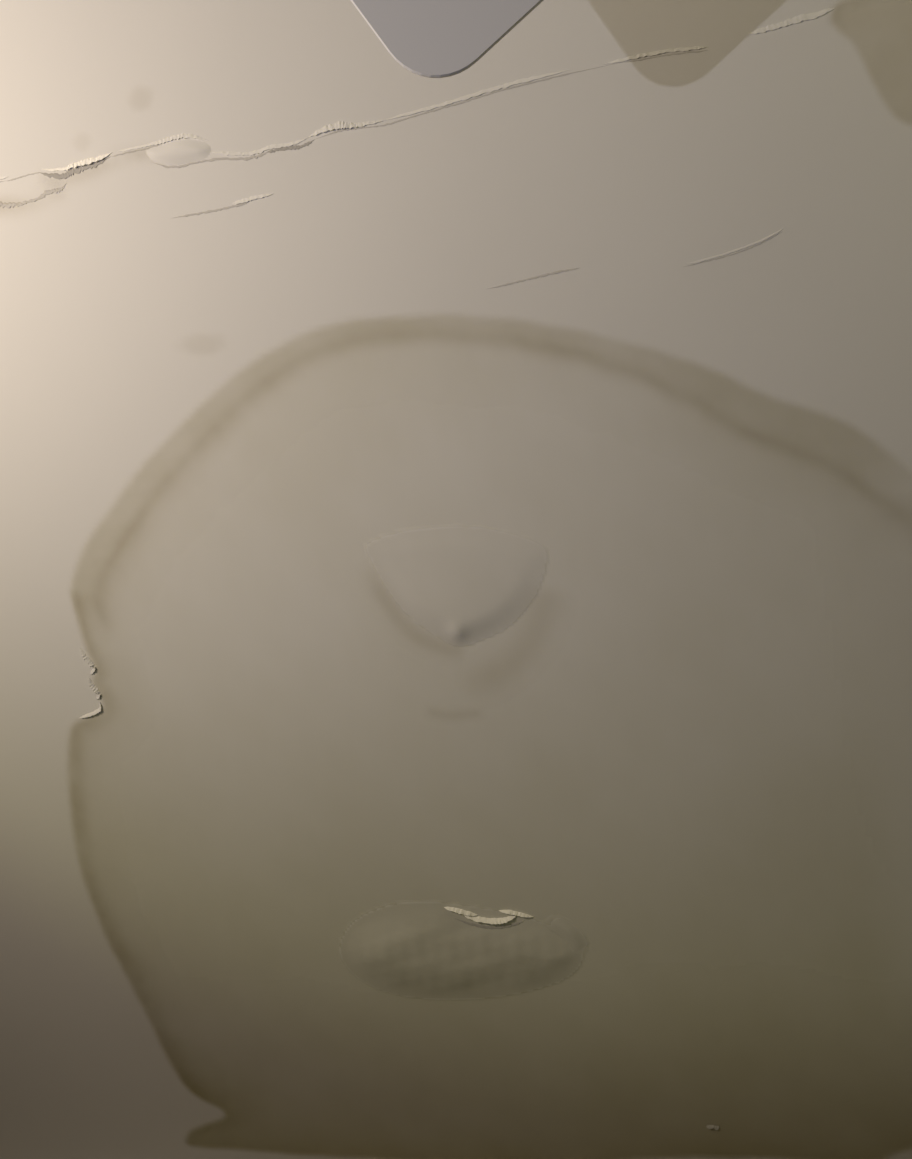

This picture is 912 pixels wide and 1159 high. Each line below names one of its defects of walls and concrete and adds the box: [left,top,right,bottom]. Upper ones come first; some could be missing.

crack [749,8,835,34]
crack [0,46,707,208]
peeling [444,907,533,929]